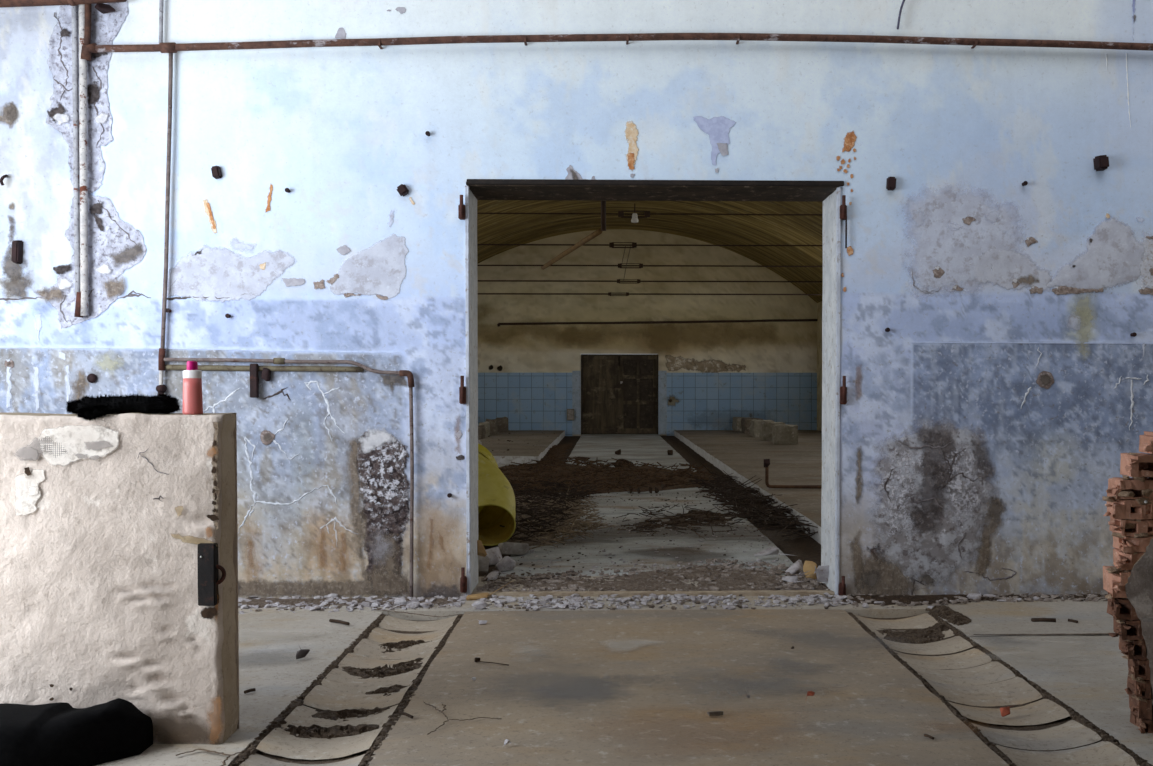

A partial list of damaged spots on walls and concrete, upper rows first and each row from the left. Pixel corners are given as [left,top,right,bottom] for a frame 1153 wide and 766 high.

spalling [36,0,147,328]
corrosion [625,121,639,178]
peeling [693,116,736,173]
corrosion [836,131,856,205]
flaking render [167,234,408,303]
flaking render [973,237,1105,295]
spalling [665,355,746,373]
flaking render [15,425,119,516]
crack [204,381,358,546]
water stain [238,430,460,598]
water stain [859,545,934,595]
water stain [978,497,1004,575]